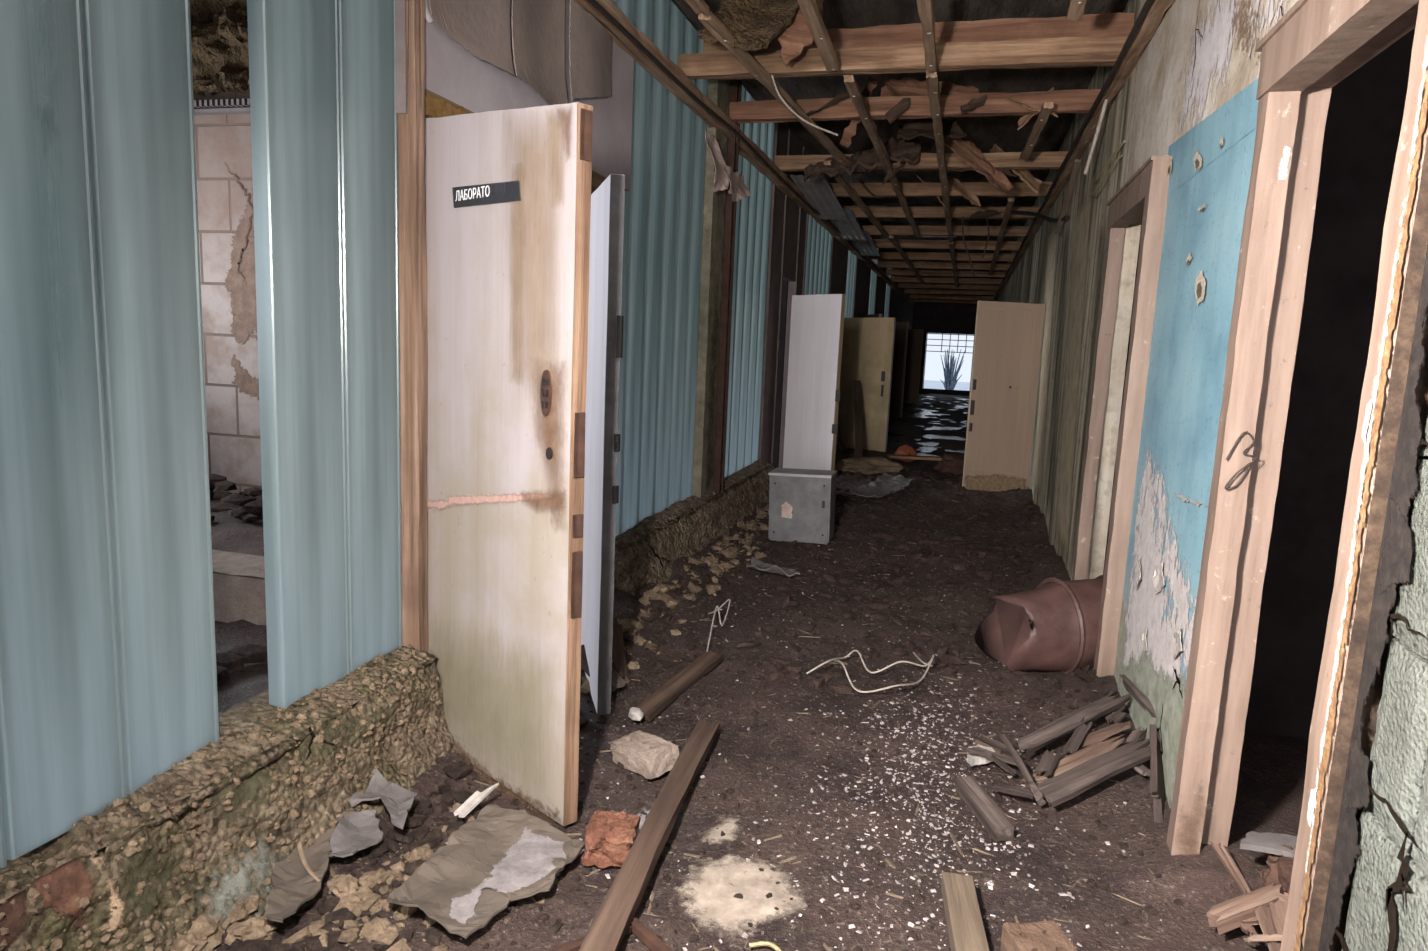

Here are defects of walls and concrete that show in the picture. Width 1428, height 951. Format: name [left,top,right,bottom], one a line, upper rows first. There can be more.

crack [224,163,254,281]
peeling [225,190,259,400]
peeling [1121,448,1197,686]
crack [1335,929,1348,951]
crack [1368,783,1418,951]